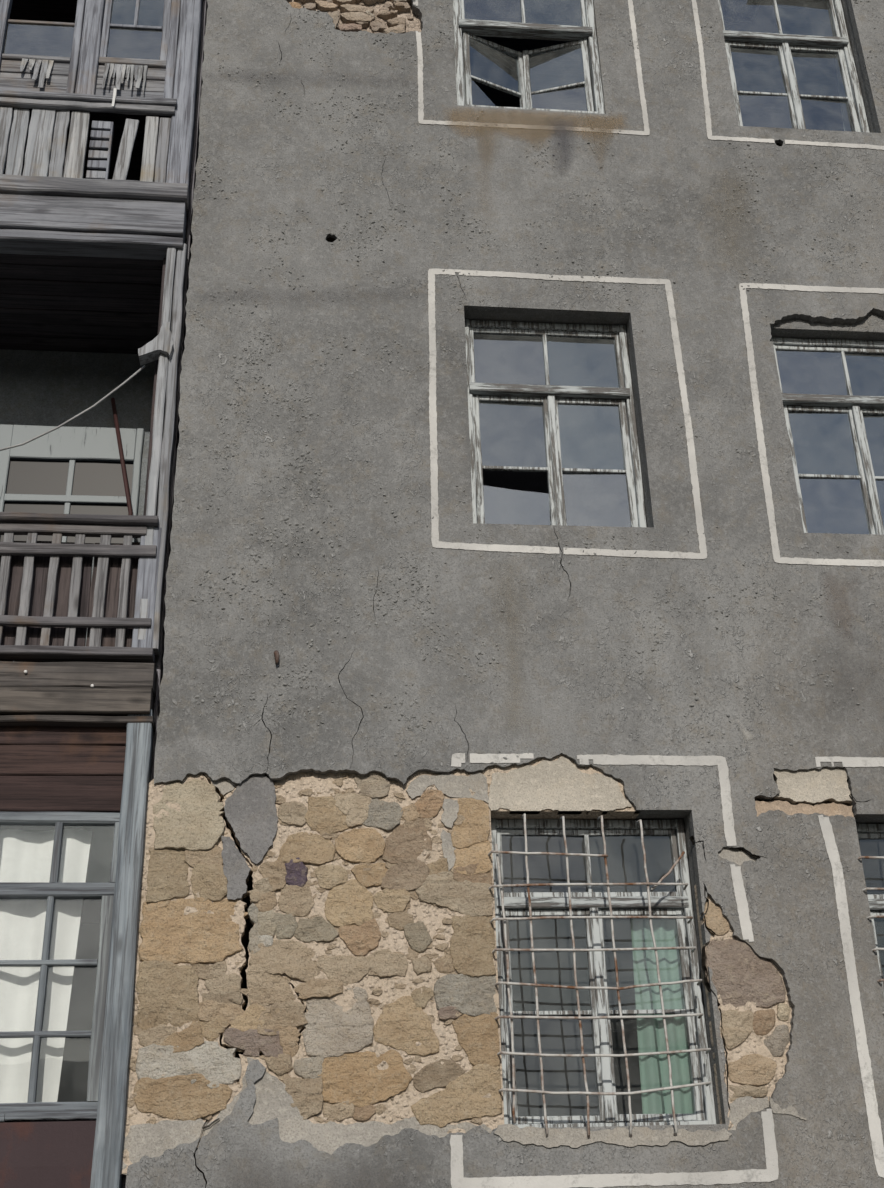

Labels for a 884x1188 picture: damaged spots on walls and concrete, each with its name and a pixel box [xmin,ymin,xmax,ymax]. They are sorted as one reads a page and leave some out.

flaking render [286,0,422,34]
flaking render [464,0,581,24]
flaking render [720,0,760,23]
flaking render [771,313,884,356]
flaking render [755,768,857,819]
crack [219,794,253,1011]
flaking render [121,754,639,1175]
flaking render [694,885,792,1130]
crack [220,1036,262,1058]